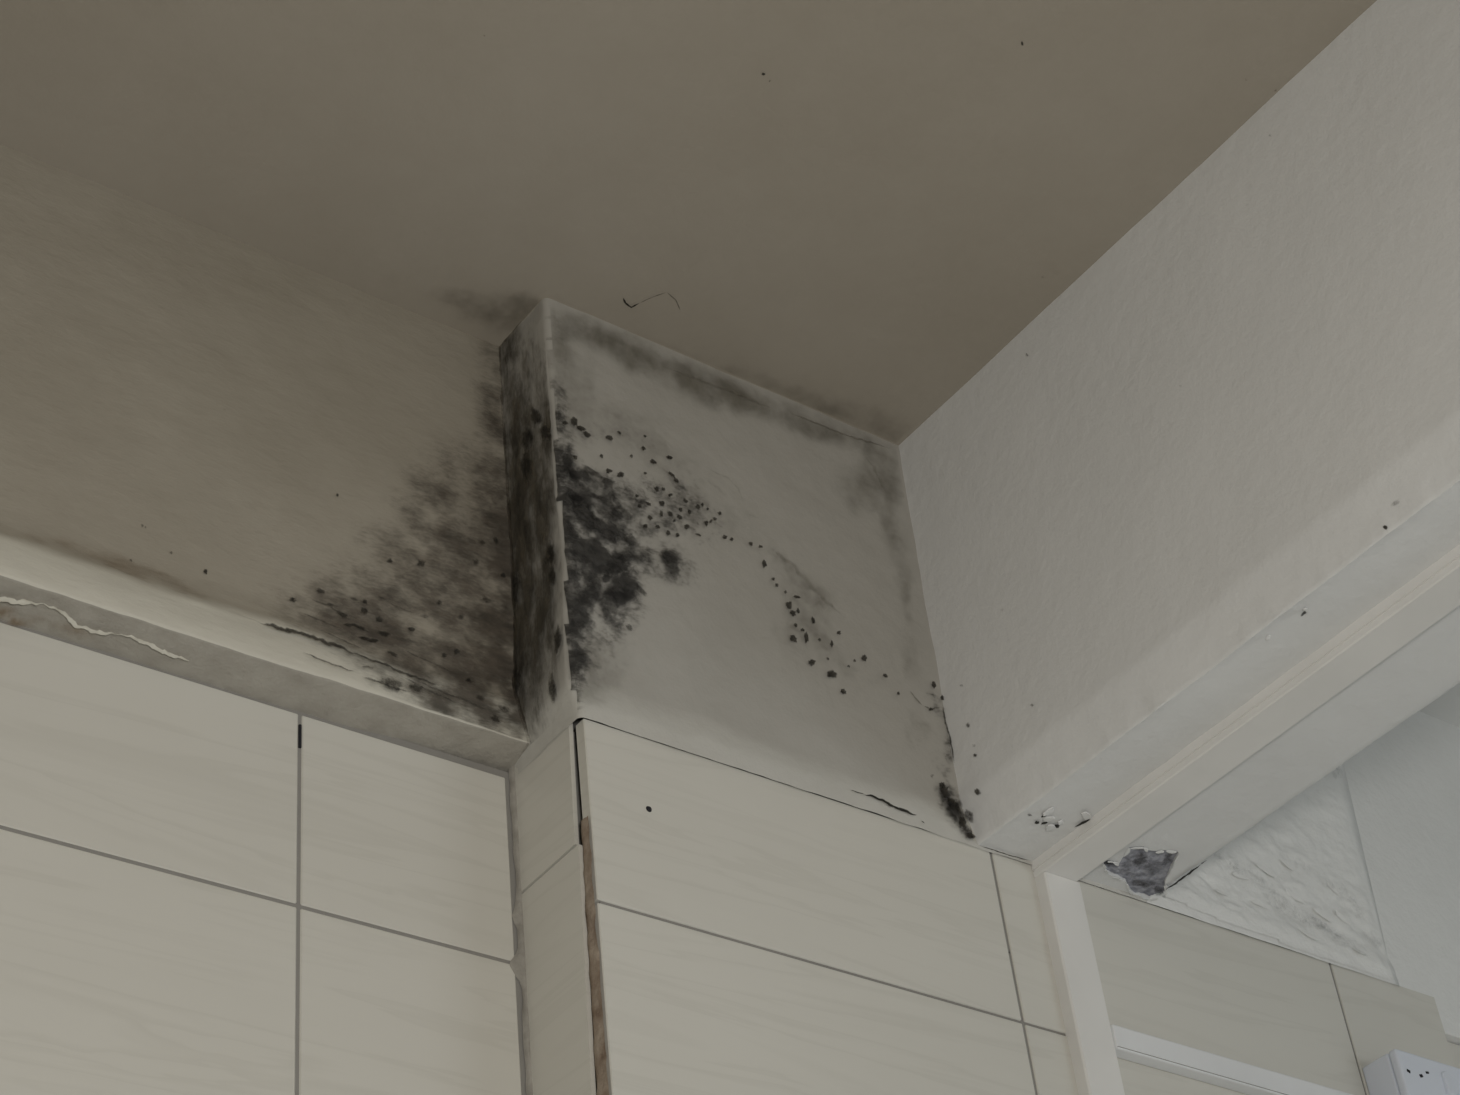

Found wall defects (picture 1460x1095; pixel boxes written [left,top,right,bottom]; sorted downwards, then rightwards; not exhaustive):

damp [265,330,867,738]
damp [929,682,954,758]
damp [939,782,980,838]
flaking render [1102,847,1180,901]